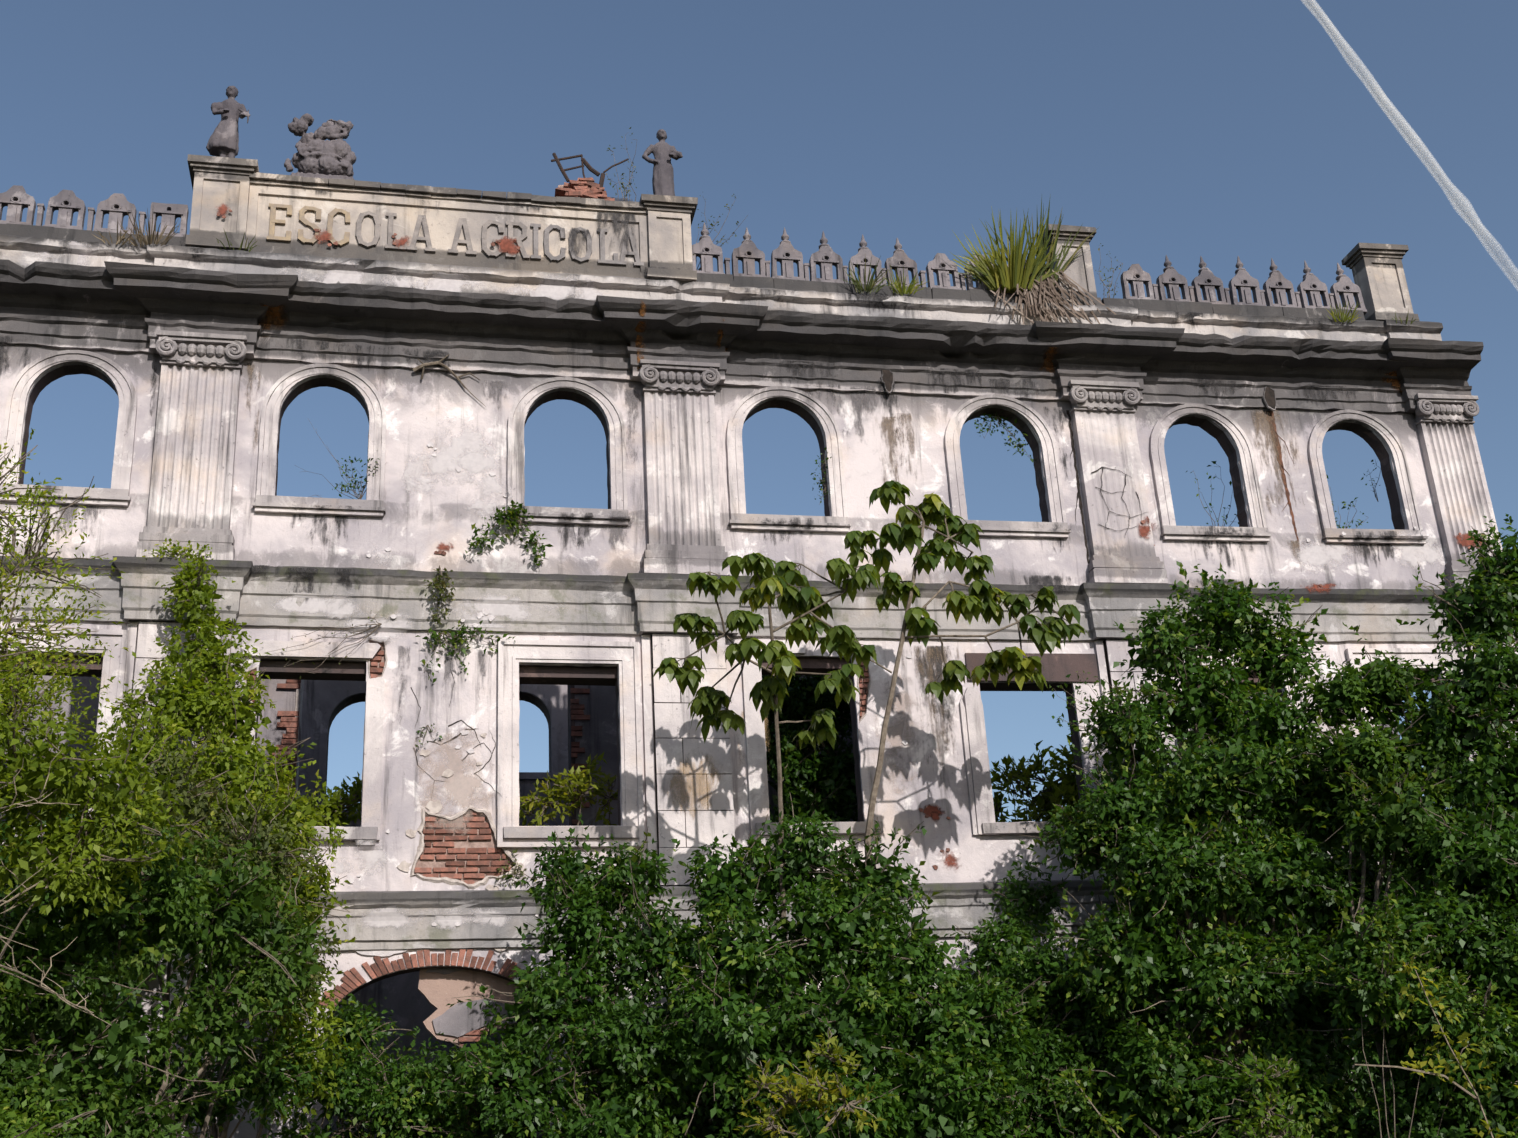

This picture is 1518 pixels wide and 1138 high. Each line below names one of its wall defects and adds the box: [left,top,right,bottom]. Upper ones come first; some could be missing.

damp [780,360,914,482]
damp [931,368,1067,431]
crack [1066,410,1146,564]
corrosion [1252,410,1297,509]
damp [916,646,959,752]
spalling [331,730,525,890]
spalling [919,804,951,821]
spalling [933,848,958,870]
flaking render [363,906,506,928]
spalling [319,947,532,1007]
flaking render [432,999,517,1047]